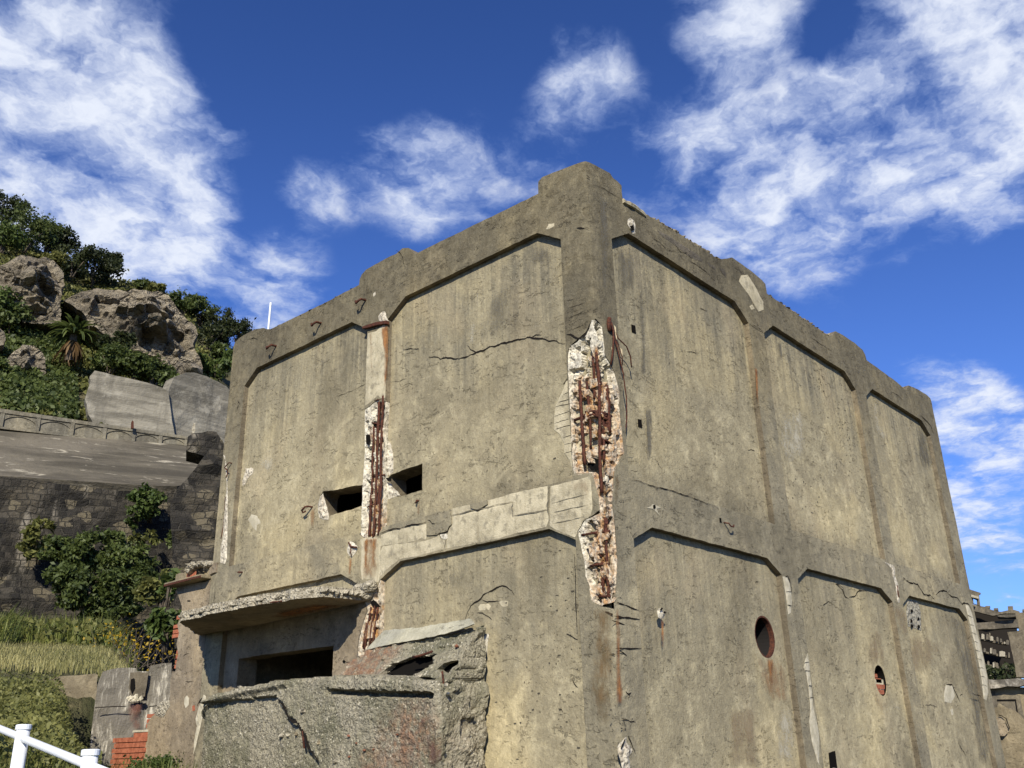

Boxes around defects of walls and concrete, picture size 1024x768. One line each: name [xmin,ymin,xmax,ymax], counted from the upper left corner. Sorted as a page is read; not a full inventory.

crack [403,299,590,360]
spalling [347,312,624,656]
crack [465,585,514,620]
spalling [387,650,458,684]
spalling [184,695,206,754]
crack [277,698,318,762]